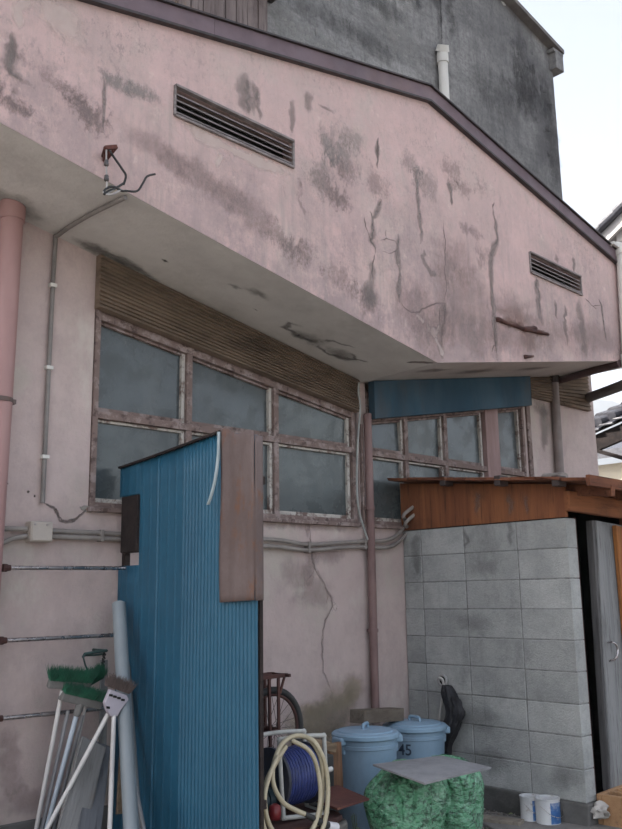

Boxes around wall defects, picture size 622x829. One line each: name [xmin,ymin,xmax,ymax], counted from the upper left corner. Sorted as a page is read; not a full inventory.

crack [364,203,447,363]
crack [489,204,498,353]
crack [309,552,333,679]